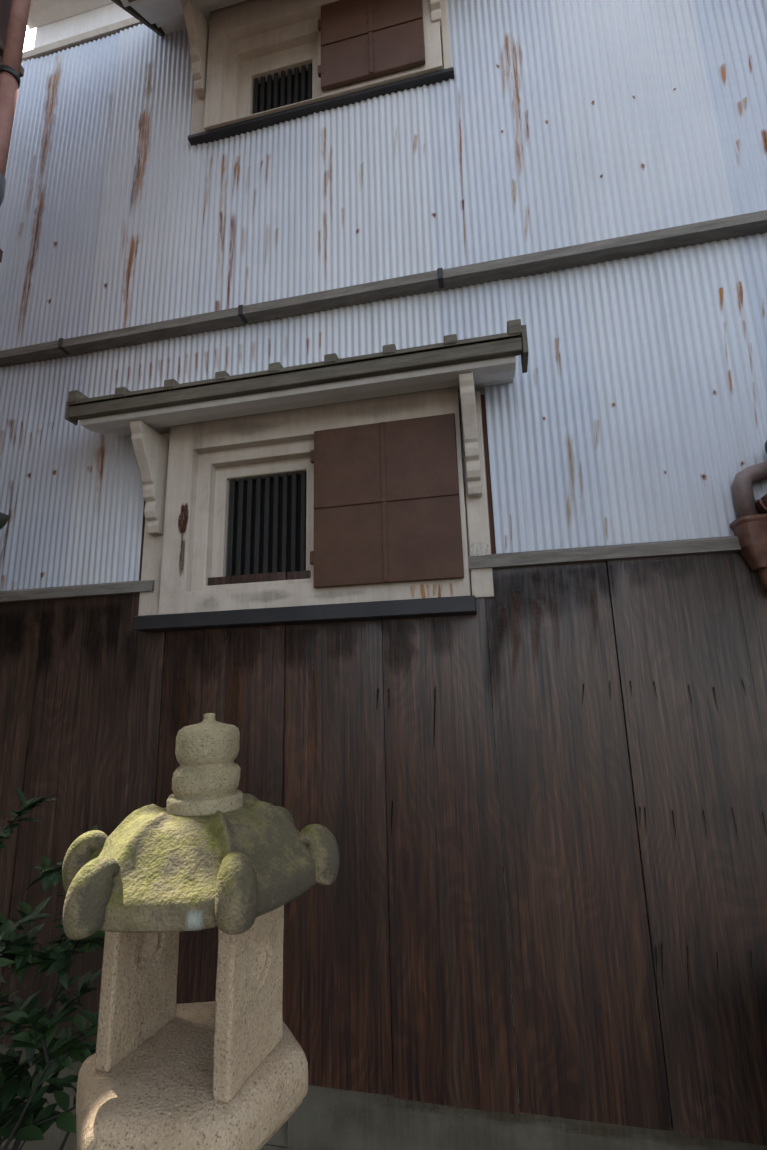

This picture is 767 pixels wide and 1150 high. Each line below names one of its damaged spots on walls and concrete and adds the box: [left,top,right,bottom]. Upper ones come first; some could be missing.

corrosion [31,58,60,177]
corrosion [131,111,149,202]
corrosion [497,36,529,137]
corrosion [21,190,44,319]
corrosion [125,238,138,321]
corrosion [215,197,234,311]